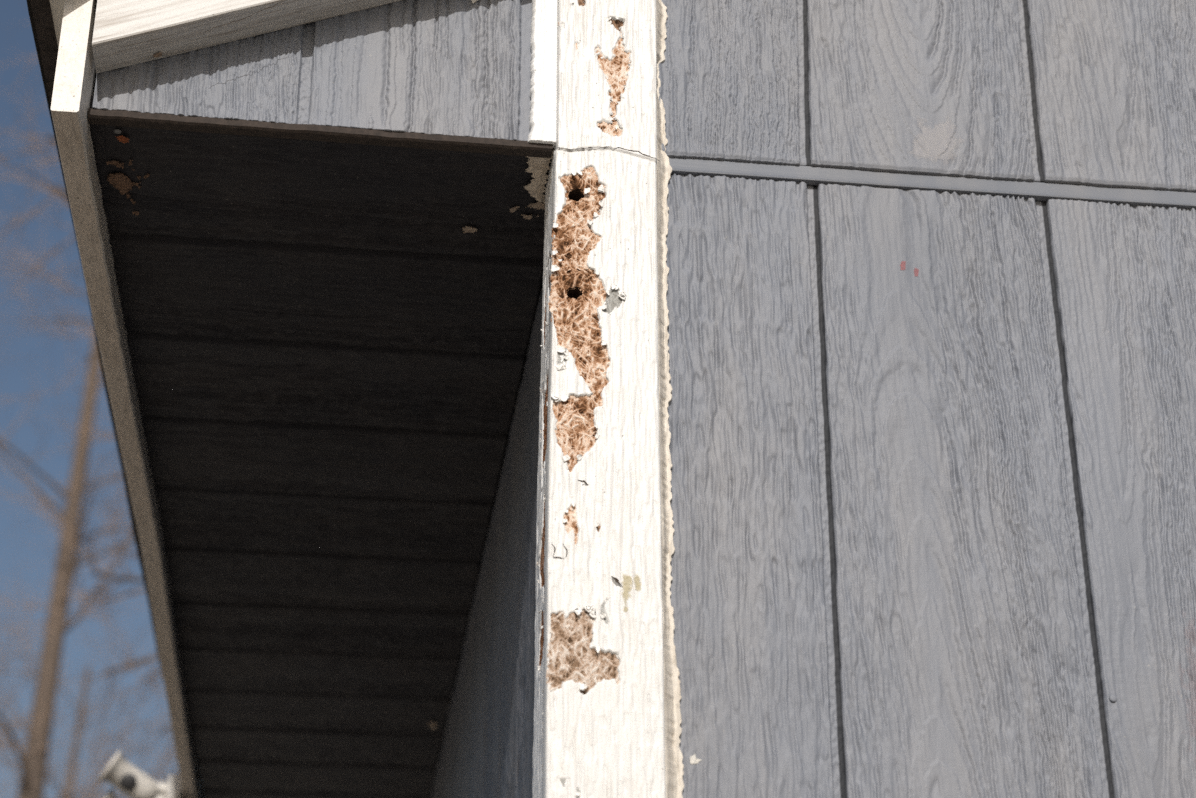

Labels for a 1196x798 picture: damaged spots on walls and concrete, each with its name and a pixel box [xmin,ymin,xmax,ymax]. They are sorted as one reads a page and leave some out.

peeling [595,17,631,136]
peeling [540,167,626,476]
peeling [536,496,620,695]